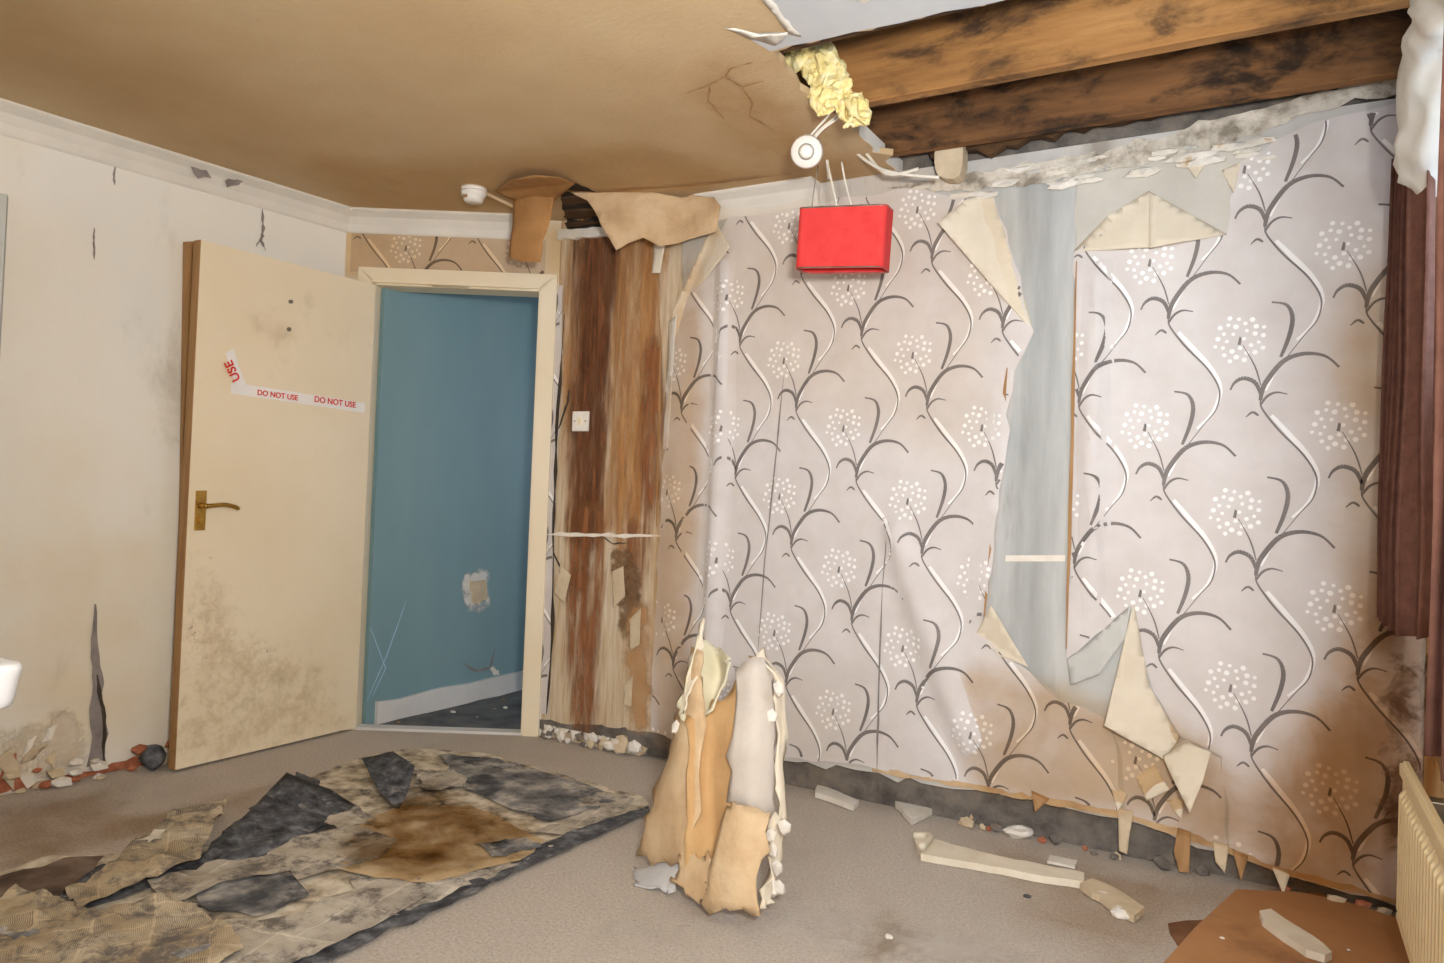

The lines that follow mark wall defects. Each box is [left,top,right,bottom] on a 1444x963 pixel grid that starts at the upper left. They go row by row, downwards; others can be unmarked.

peeling [725,0,1008,54]
flaking render [557,183,608,241]
leakage [541,219,683,756]
flaking render [462,570,489,611]
flaking render [554,563,571,604]
flaking render [611,550,641,650]
flaking render [623,676,633,706]
leakage [1386,654,1428,719]
flaking render [0,744,148,794]
leakage [1386,762,1416,841]